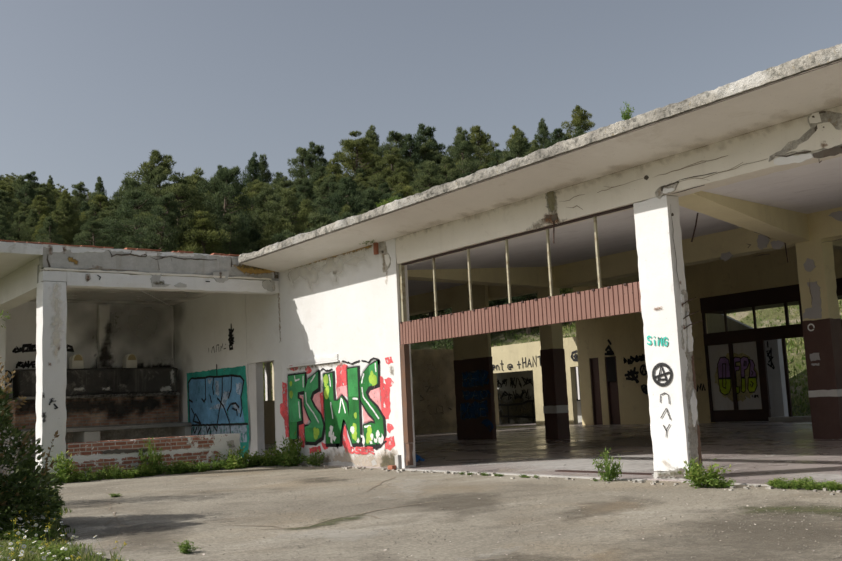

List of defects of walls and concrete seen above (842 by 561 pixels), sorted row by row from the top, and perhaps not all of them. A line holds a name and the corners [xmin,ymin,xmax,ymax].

spalling [768,111,842,166]
spalling [541,190,558,244]
spalling [655,181,679,199]
crack [567,151,811,288]
crack [78,250,232,271]
spalling [656,290,703,478]